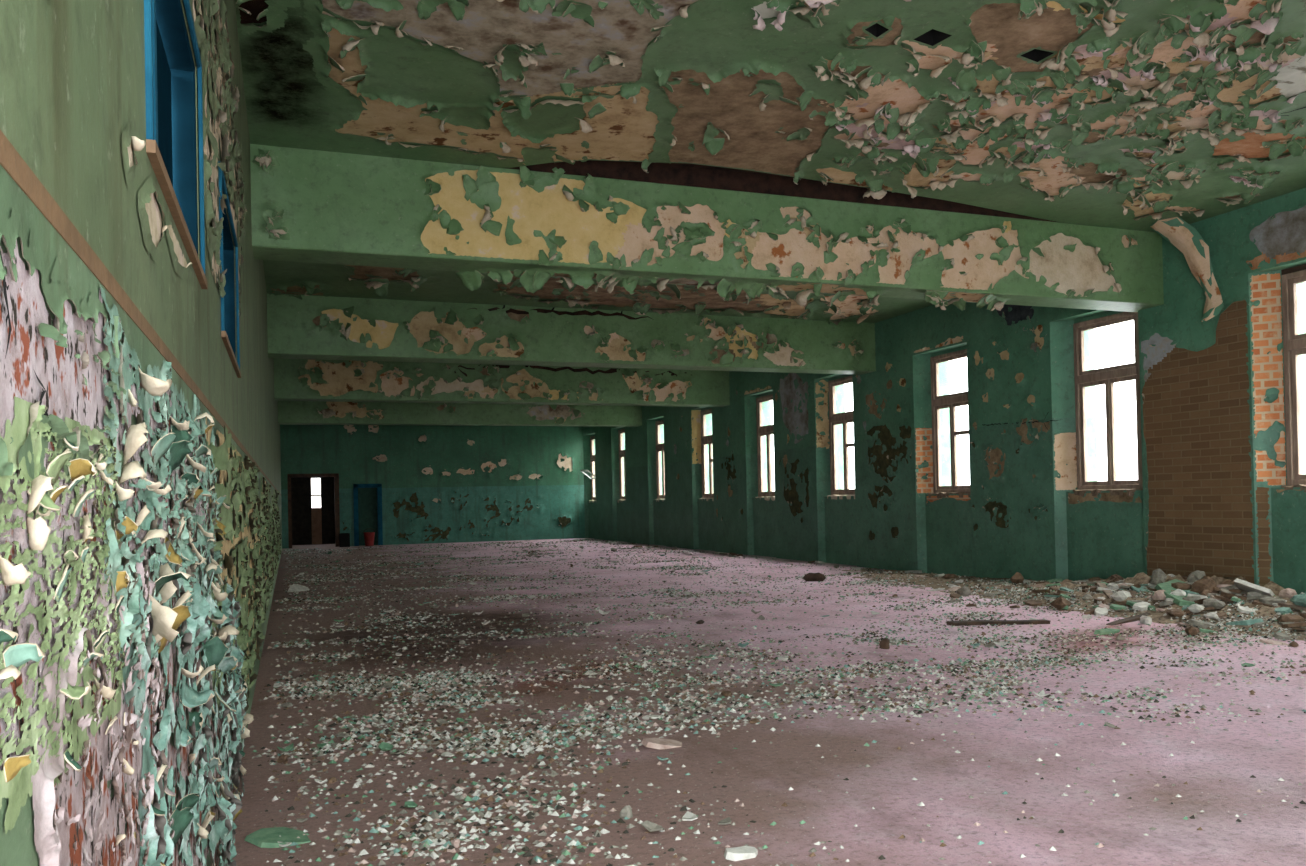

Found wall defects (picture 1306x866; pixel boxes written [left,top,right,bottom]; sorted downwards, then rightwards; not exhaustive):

damp [239,0,314,123]
peeling [121,123,193,281]
crack [508,160,1056,222]
peeling [193,0,1306,586]
peeling [0,193,281,866]